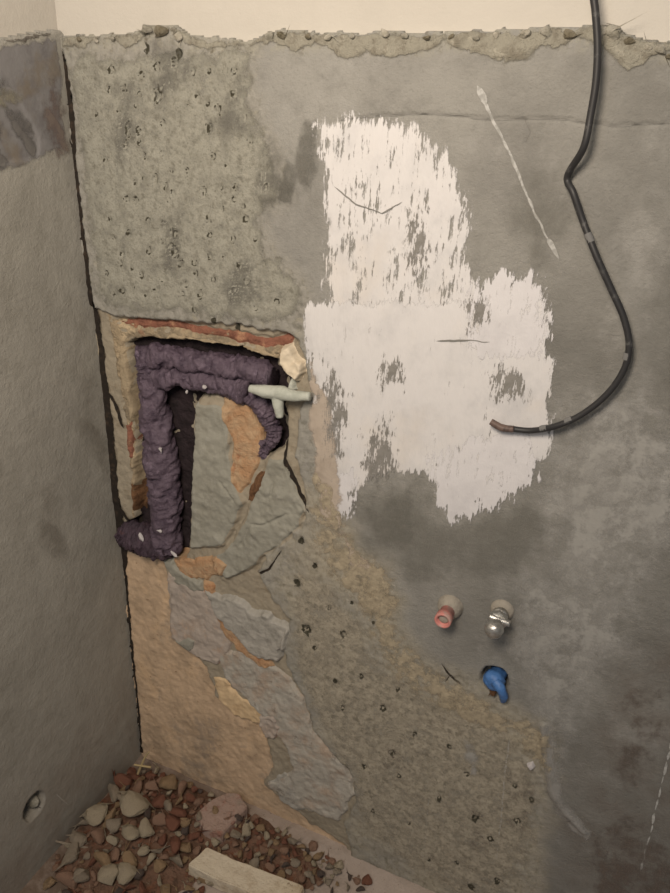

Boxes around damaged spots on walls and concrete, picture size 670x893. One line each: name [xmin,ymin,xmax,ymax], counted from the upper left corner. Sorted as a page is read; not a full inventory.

spalling [4,33,50,42]
crack [341,113,670,140]
spalling [62,10,670,390]
flaking render [126,421,143,458]
crack [283,428,309,512]
crack [258,551,281,574]
spalling [123,547,356,847]